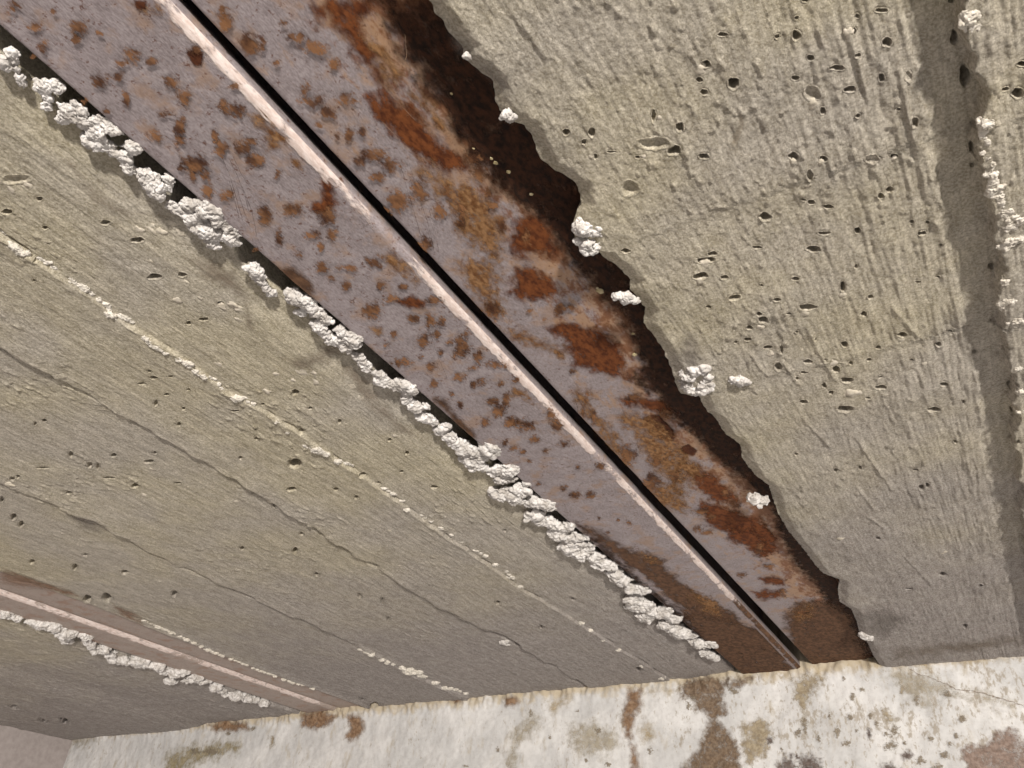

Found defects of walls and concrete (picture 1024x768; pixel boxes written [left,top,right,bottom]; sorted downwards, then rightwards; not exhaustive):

rust [186,45,203,66]
rust [216,6,266,57]
spalling [790,74,827,116]
rust [146,76,286,202]
spalling [633,107,685,160]
peeling [571,217,603,238]
hole [691,250,730,281]
rust [257,0,874,674]
hole [821,345,888,414]
spalling [241,257,740,662]
water stain [165,743,237,768]
water stain [572,725,615,753]